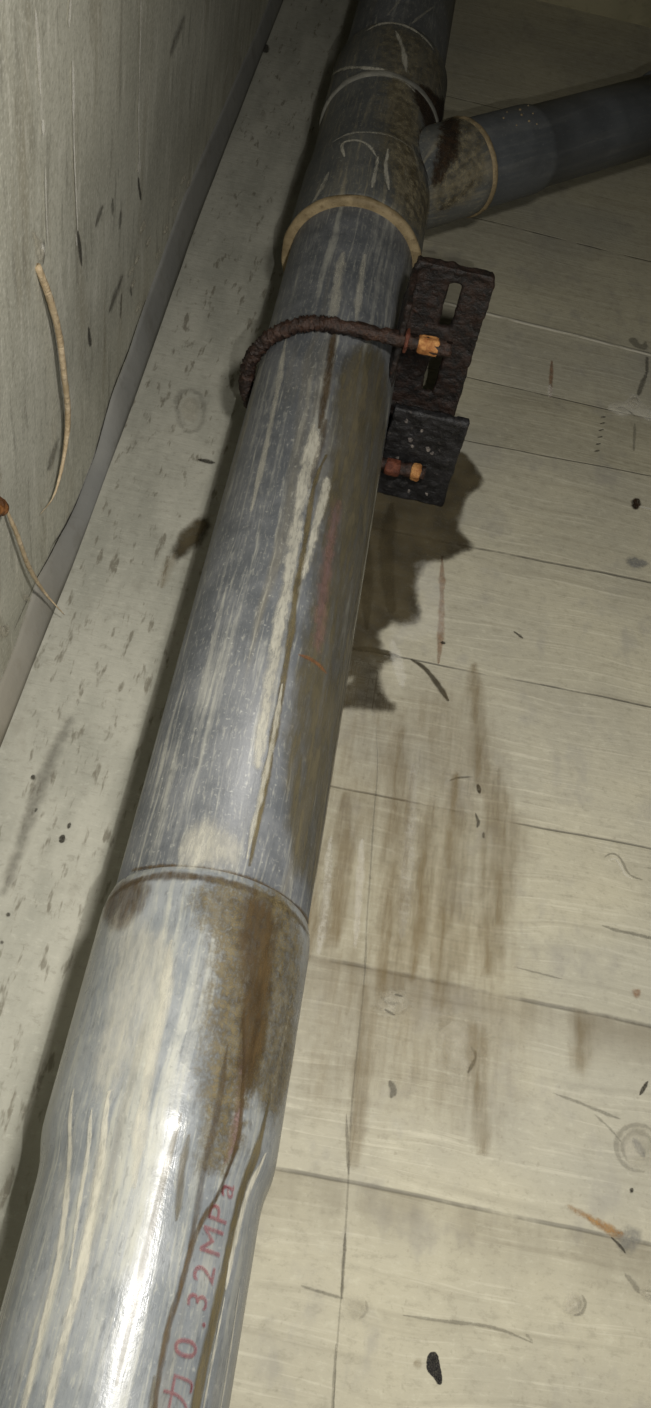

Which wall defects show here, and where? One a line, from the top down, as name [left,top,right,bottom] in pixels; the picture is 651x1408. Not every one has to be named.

leakage [247,334,482,887]